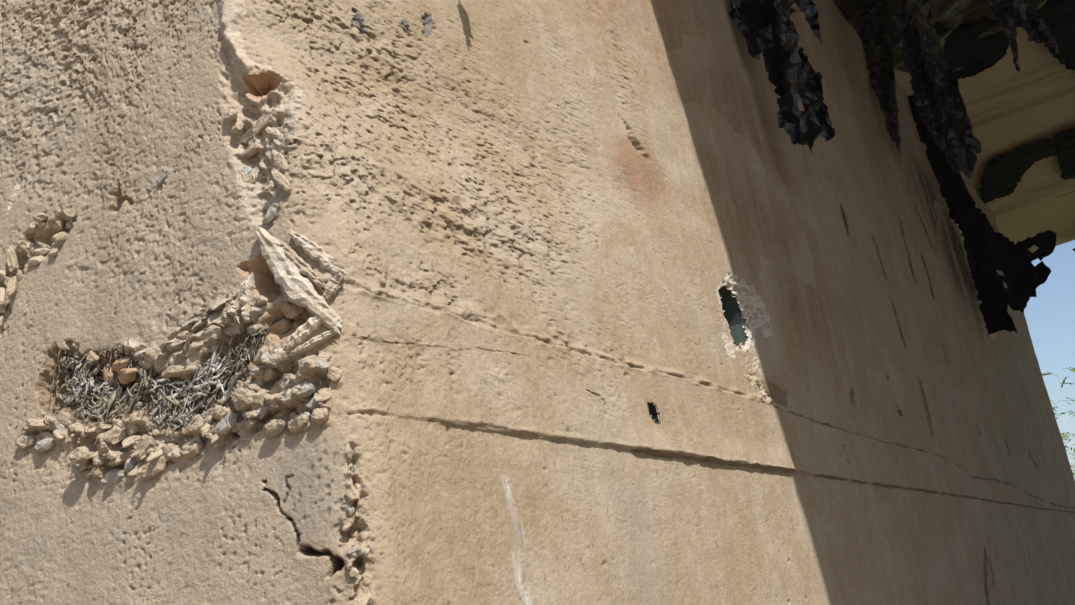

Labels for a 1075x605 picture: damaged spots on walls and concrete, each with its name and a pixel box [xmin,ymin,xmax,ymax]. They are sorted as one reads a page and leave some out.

peeling [6,246,18,298]
spalling [15,0,347,489]
crack [351,336,532,358]
spalling [715,272,773,352]
crack [631,400,1075,513]
crack [262,474,345,577]
spalling [337,441,376,605]